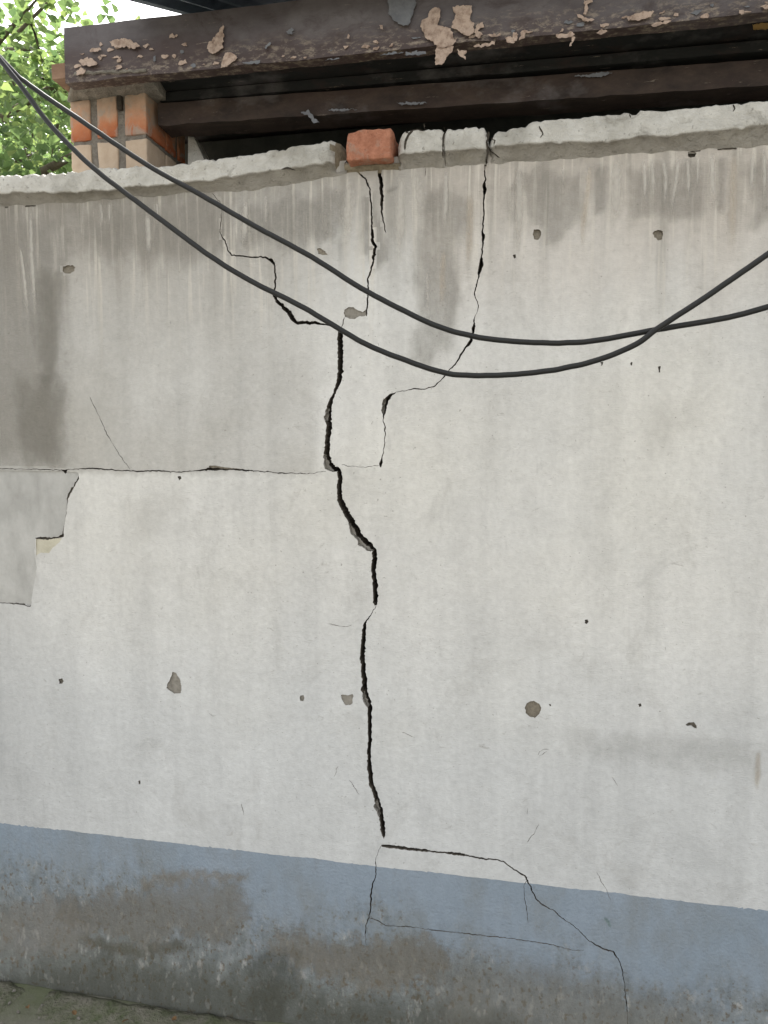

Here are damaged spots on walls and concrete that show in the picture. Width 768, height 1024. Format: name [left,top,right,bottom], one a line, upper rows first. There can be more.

peeling [74,23,271,76]
peeling [361,0,533,65]
peeling [556,0,609,46]
peeling [621,4,714,27]
peeling [739,2,768,30]
crack [404,124,446,175]
leakage [21,220,35,299]
peeling [0,470,79,607]
crack [0,132,628,1024]
spalling [167,672,181,694]
spalling [341,694,353,705]
spalling [525,701,551,718]